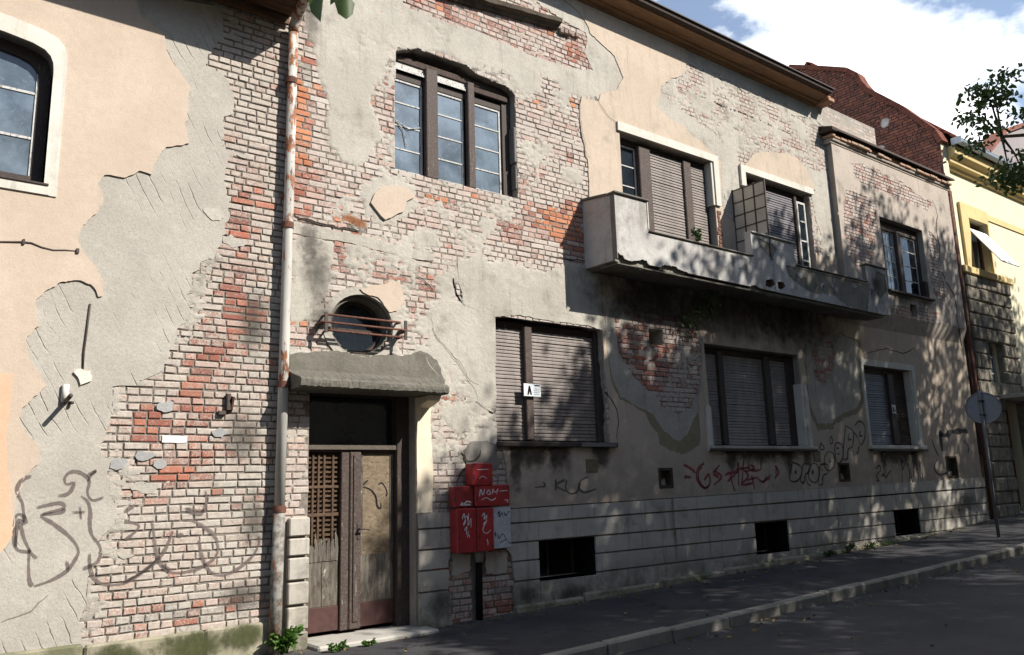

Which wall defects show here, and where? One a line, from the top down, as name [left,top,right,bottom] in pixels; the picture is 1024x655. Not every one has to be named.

flaking render [0,0,703,655]
flaking render [658,50,946,324]